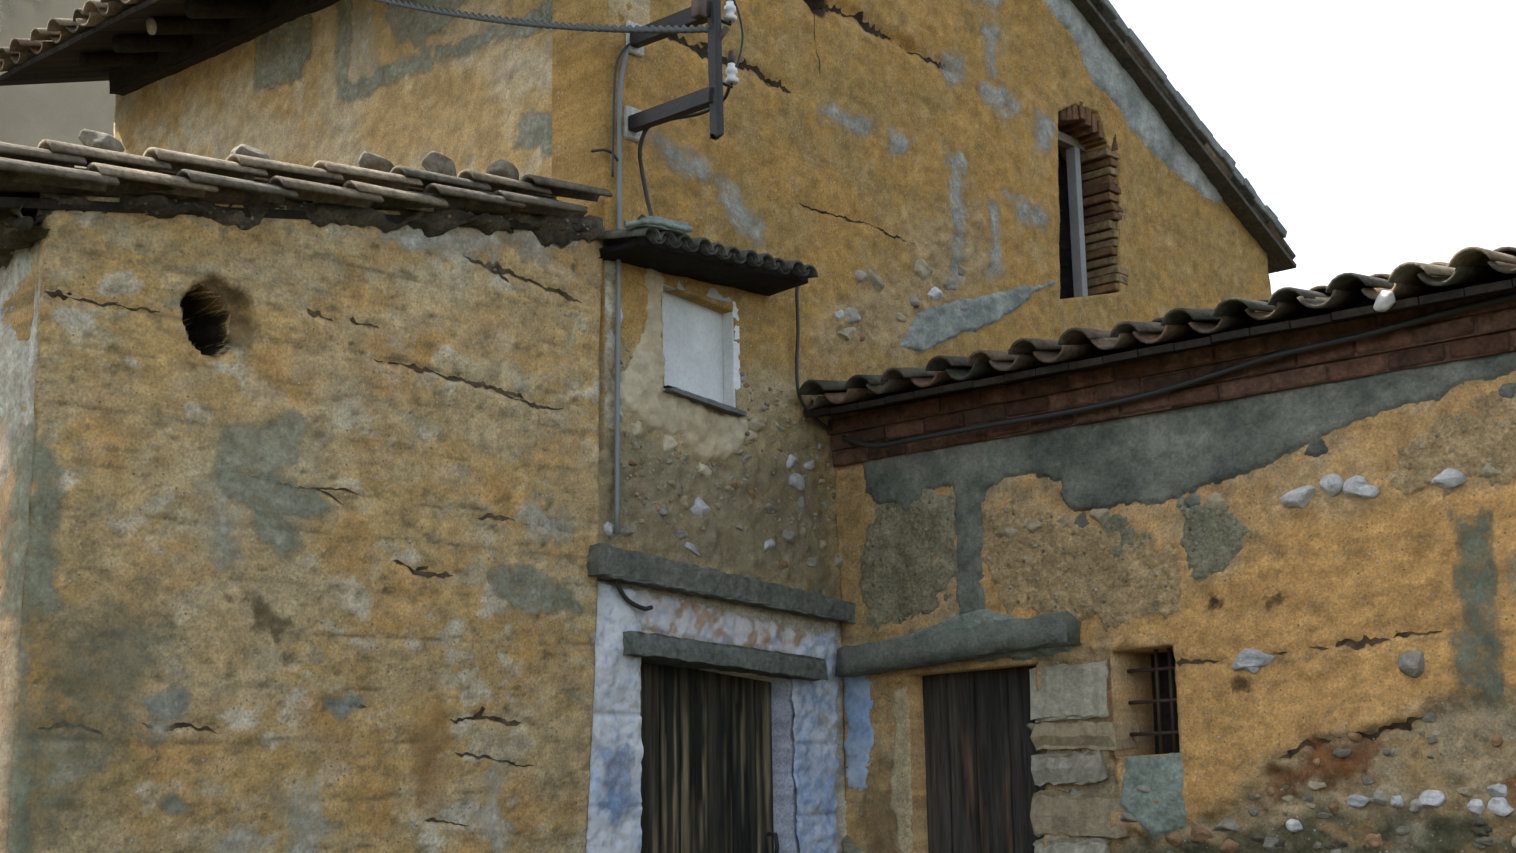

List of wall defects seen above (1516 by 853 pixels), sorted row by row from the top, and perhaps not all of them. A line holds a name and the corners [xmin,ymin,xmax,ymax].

spalling [804,0,826,17]
crack [668,0,951,93]
crack [799,203,914,244]
crack [45,289,159,313]
spalling [180,274,255,357]
crack [393,560,453,578]
water stain [1451,510,1516,699]
crack [1273,631,1442,655]
crack [1176,657,1219,667]
spalling [1232,677,1250,692]
crack [450,706,534,767]